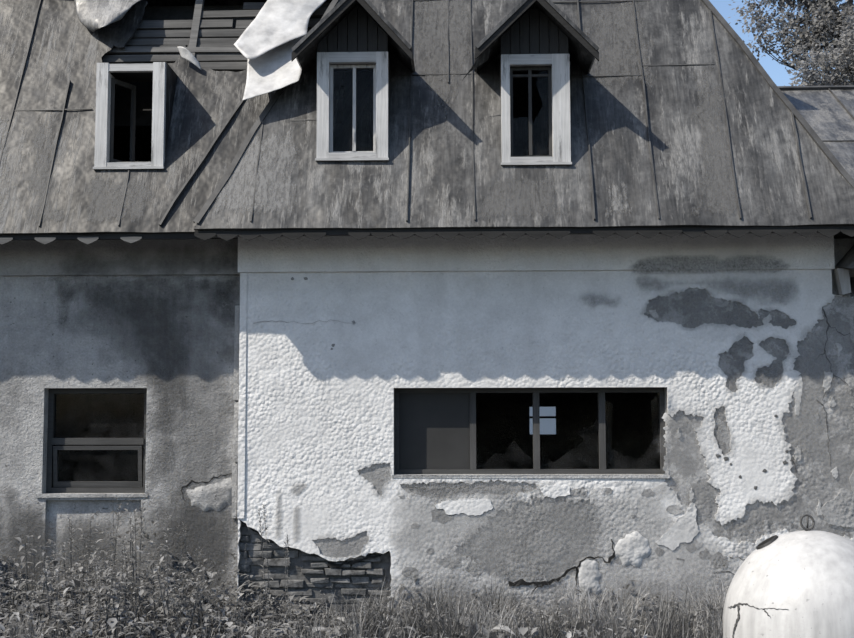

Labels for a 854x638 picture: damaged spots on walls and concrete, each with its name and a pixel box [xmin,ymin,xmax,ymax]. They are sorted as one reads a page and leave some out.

spalling [644,288,854,569]
flaking render [239,523,391,624]
spalling [357,463,614,586]
crack [509,539,615,597]